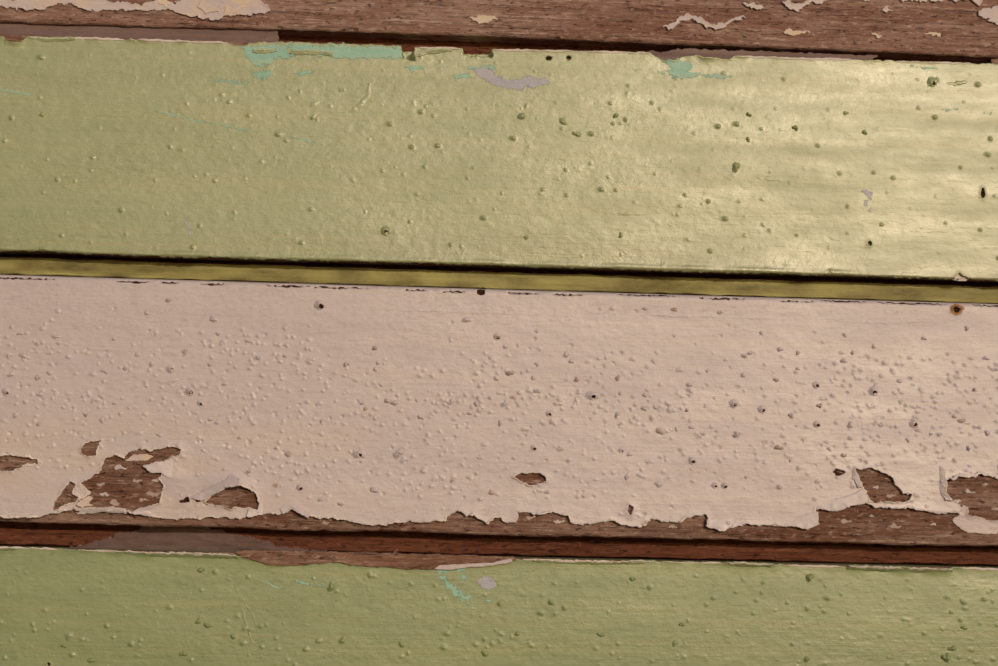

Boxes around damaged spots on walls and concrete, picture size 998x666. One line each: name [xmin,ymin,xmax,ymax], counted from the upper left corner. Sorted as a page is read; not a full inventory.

peeling [0,0,270,21]
peeling [468,15,498,25]
peeling [663,2,764,31]
peeling [783,28,810,36]
peeling [782,0,827,13]
peeling [900,0,998,26]
peeling [0,438,998,545]
spalling [123,550,517,607]